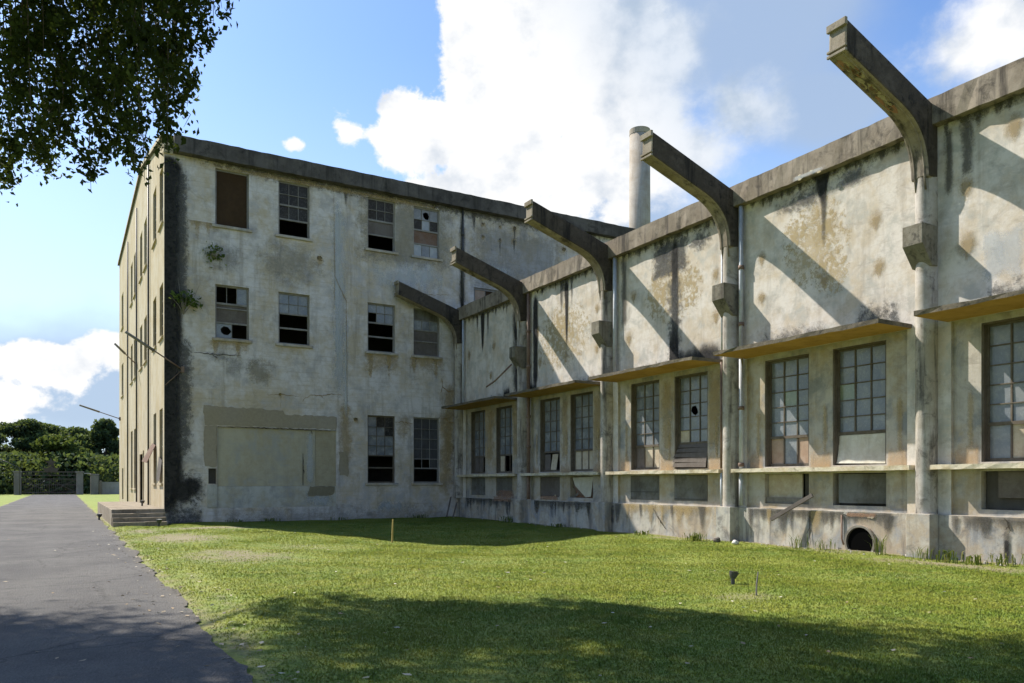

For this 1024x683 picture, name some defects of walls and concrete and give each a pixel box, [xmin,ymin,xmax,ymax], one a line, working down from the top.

leakage [750,143,900,235]
leakage [944,93,1024,192]
leakage [164,157,204,524]
leakage [621,219,721,366]
leakage [748,508,892,531]
leakage [952,516,1024,562]